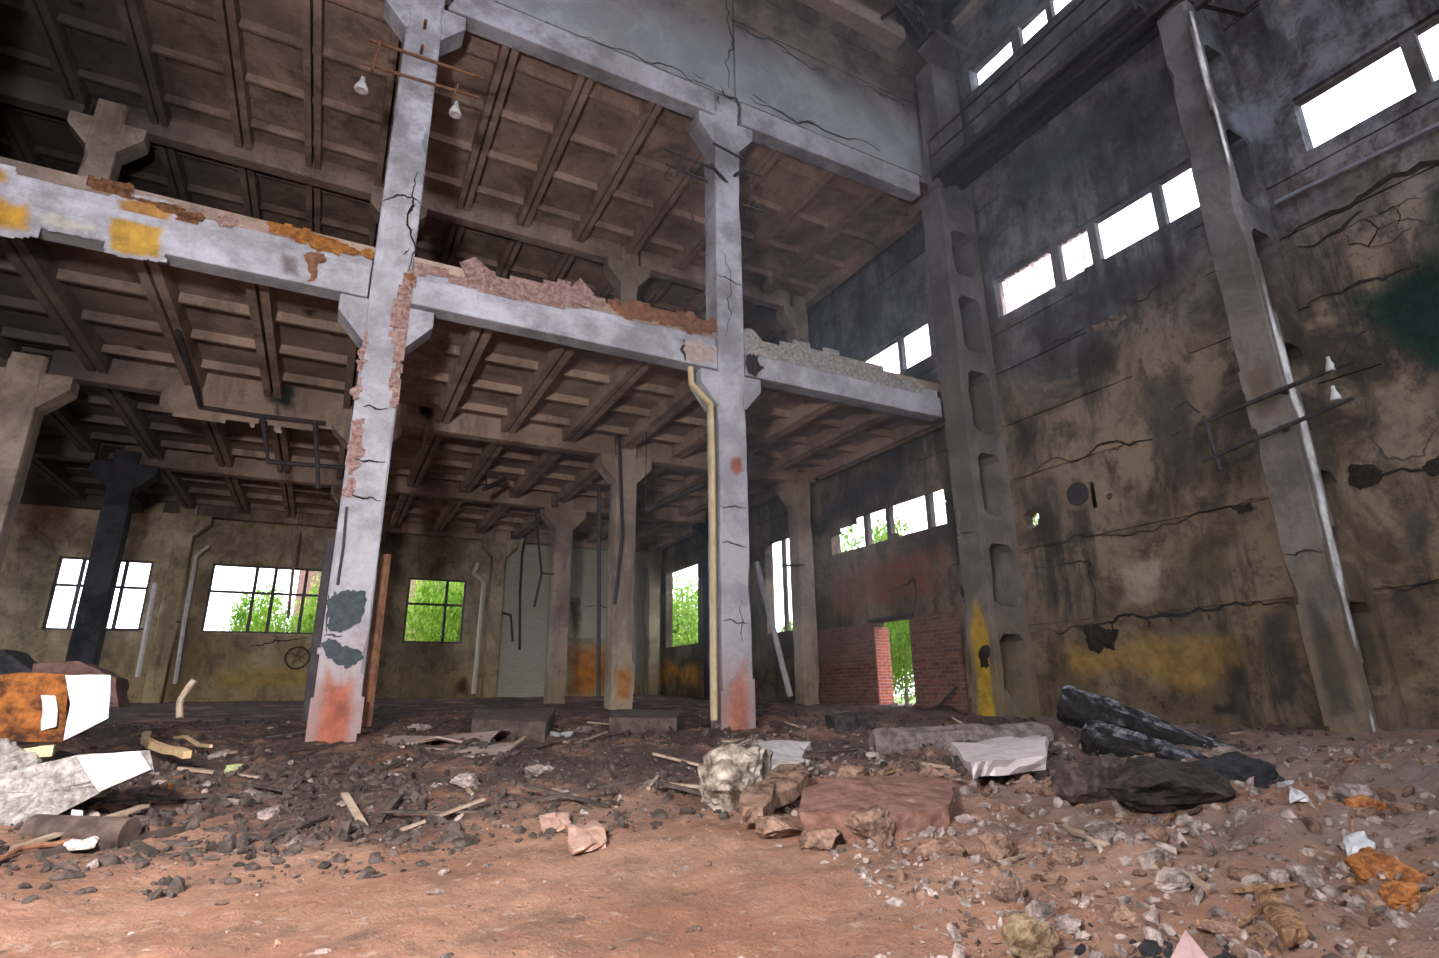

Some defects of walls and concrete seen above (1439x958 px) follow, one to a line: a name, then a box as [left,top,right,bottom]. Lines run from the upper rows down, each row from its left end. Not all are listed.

crack [494,0,880,151]
water stain [1187,7,1235,176]
rust [102,194,177,263]
rust [304,252,327,282]
spalling [342,418,365,497]
spalling [388,257,718,408]
spalling [744,327,925,394]
water stain [1054,226,1377,734]
crack [1287,160,1439,305]
water stain [1352,369,1439,480]
crack [1023,498,1289,635]
rust [305,642,365,743]